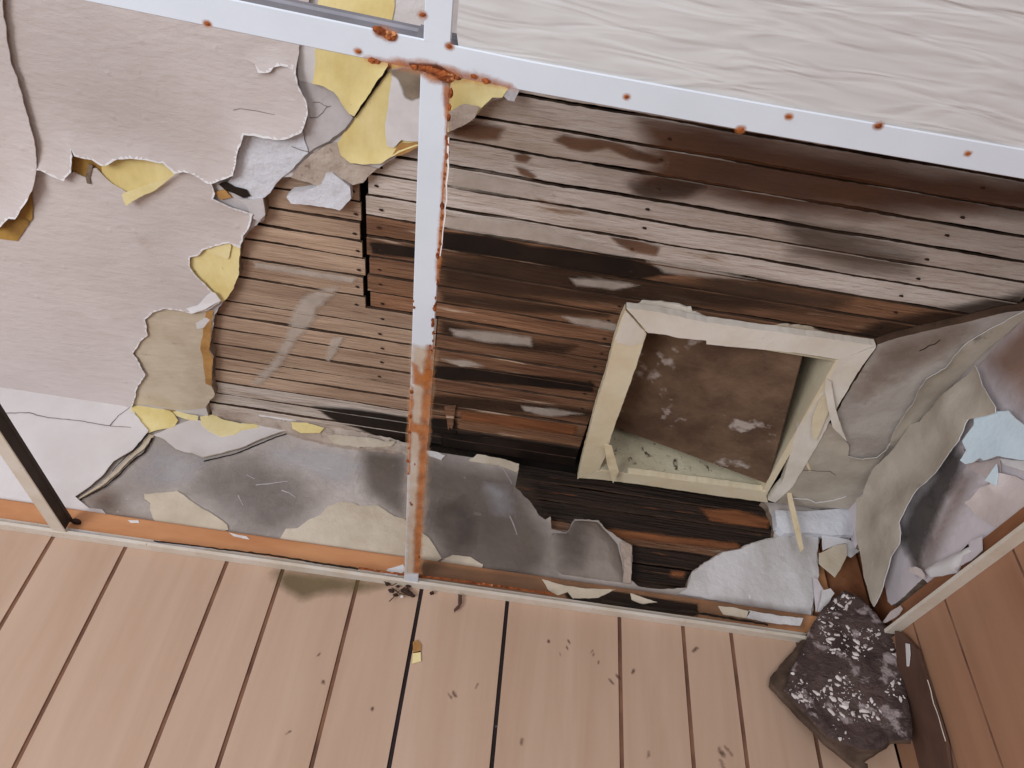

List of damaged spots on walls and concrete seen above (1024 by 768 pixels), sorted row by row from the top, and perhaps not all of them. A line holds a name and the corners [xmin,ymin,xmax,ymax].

rust [372,26,397,41]
rust [355,49,510,121]
water stain [454,124,502,139]
water stain [555,122,1024,212]
flaking render [0,45,422,514]
water stain [442,232,836,316]
rust [154,135,554,595]
flaking render [420,88,1024,607]
peeling [144,491,250,540]
peeling [280,502,406,576]
water stain [429,397,589,567]
rust [602,599,768,626]